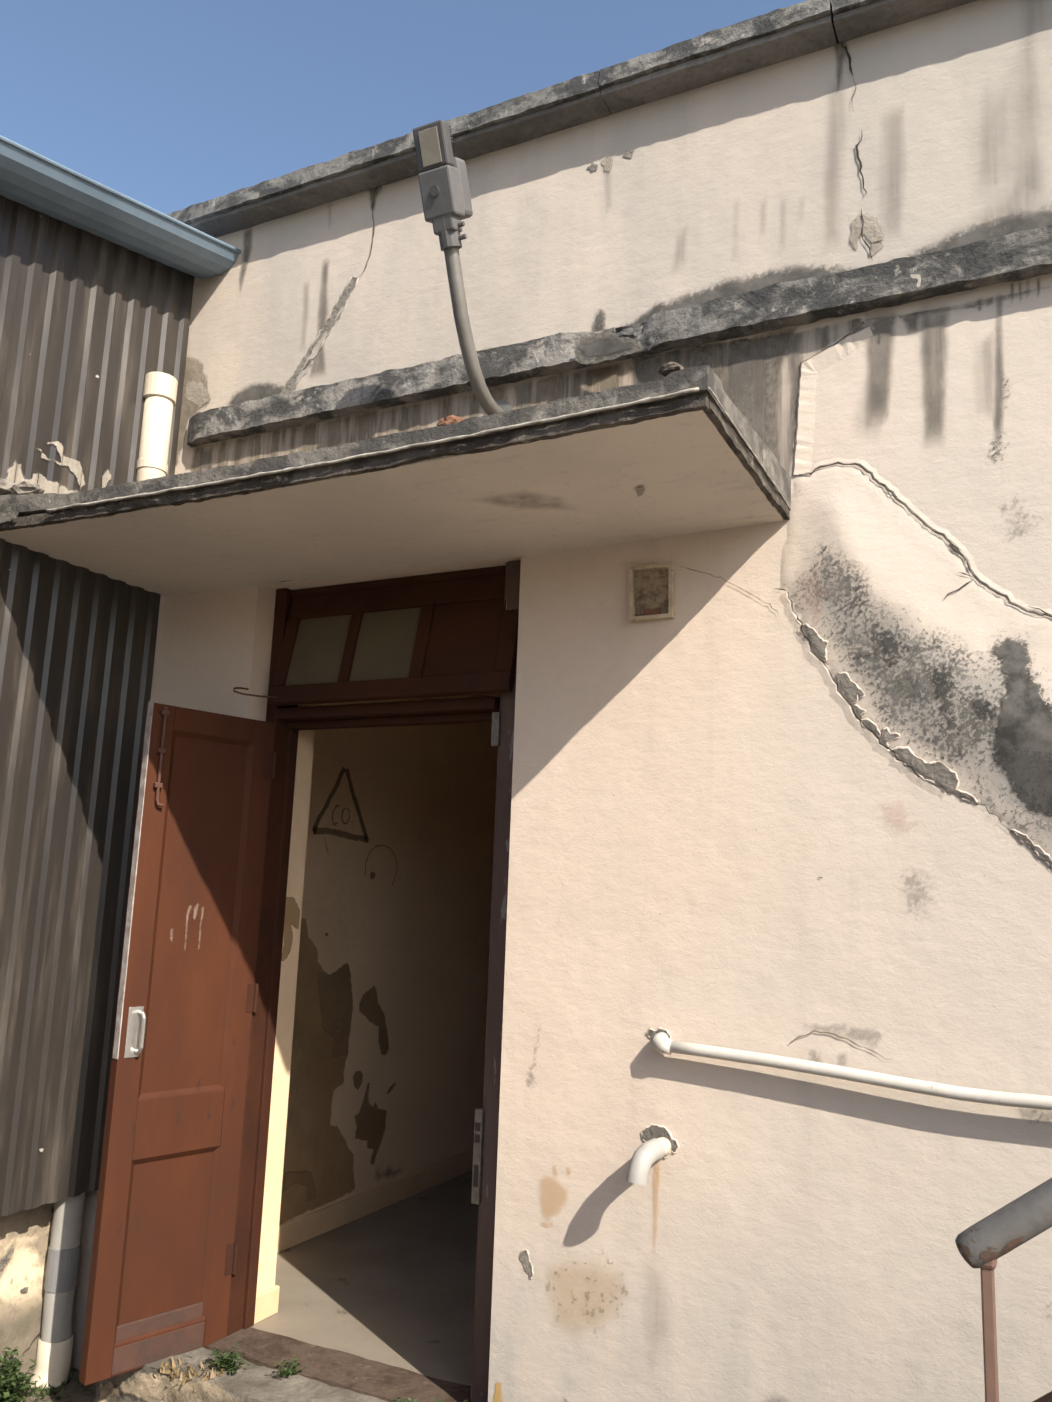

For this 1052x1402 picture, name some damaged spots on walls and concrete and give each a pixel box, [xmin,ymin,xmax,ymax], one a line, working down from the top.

crack [361,187,377,275]
peeling [850,213,909,259]
spalling [0,392,790,532]
leakage [192,326,829,473]
leakage [850,313,944,429]
leakage [991,328,1009,462]
crack [792,457,1052,618]
leakage [795,550,1052,842]
corrosion [980,1237,1024,1263]